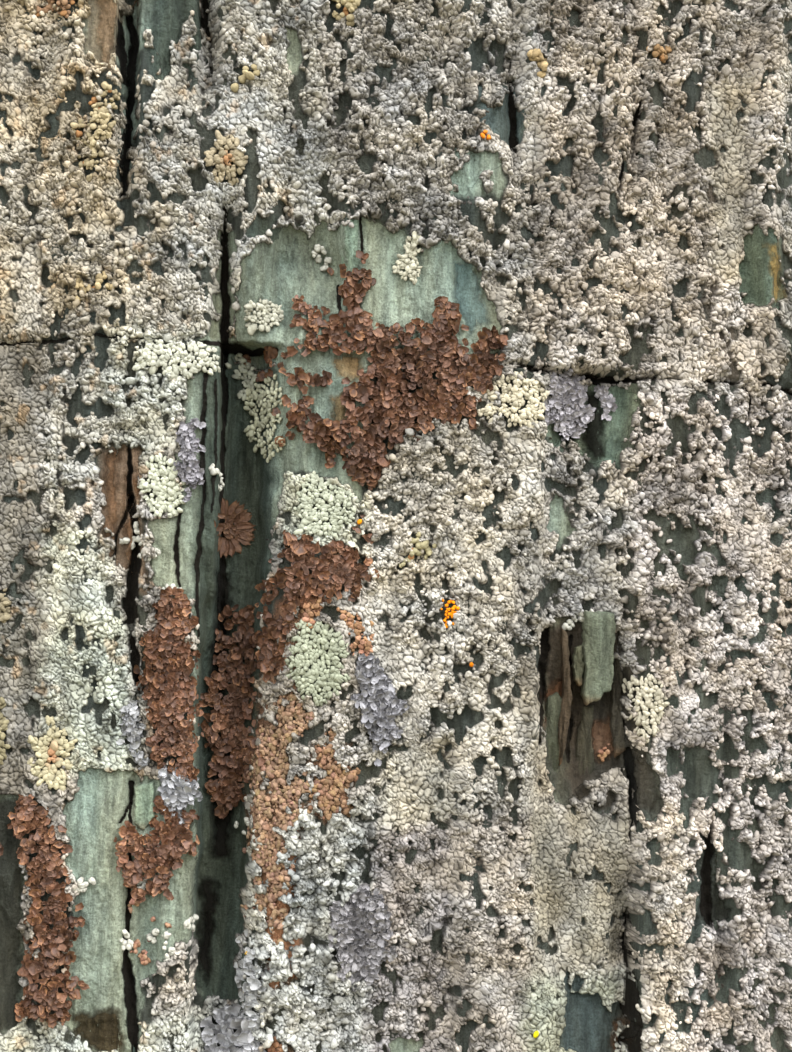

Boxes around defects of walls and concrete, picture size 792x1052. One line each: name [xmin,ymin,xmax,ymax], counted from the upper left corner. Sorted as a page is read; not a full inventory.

crack [113,444,144,700]
crack [173,205,278,656]